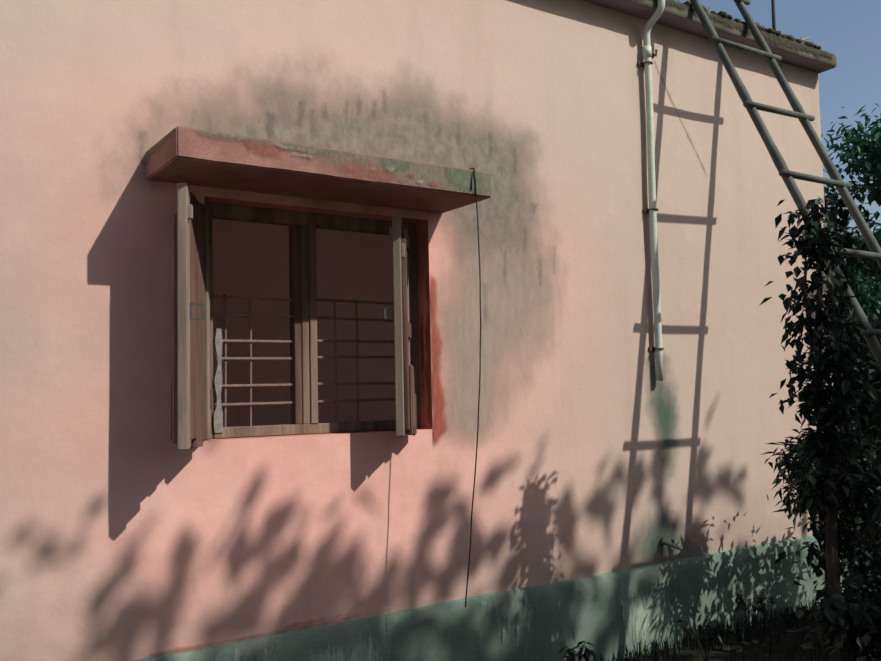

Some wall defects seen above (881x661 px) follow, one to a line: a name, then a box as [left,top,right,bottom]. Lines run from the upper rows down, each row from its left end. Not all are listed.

water stain [191,85,549,433]
corrosion [420,275,446,444]